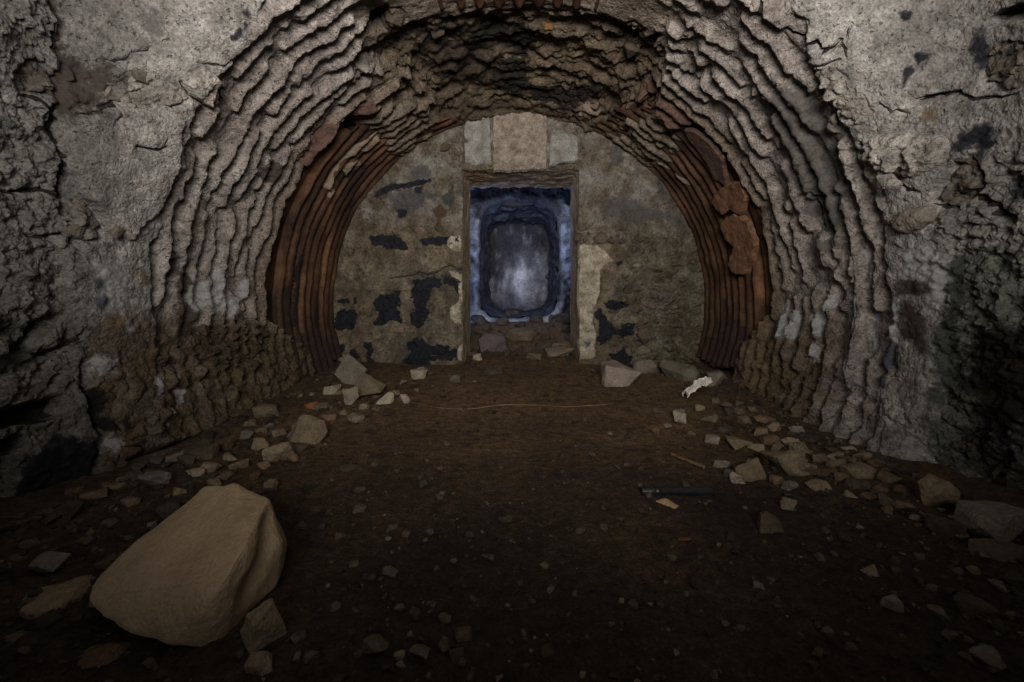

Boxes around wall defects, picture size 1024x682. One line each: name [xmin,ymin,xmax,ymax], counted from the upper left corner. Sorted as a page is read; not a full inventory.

corrosion [296,98,378,167]
crack [873,90,1018,118]
corrosion [712,180,759,275]
peeling [443,270,464,324]
peeling [574,226,629,359]
leakage [775,295,839,363]